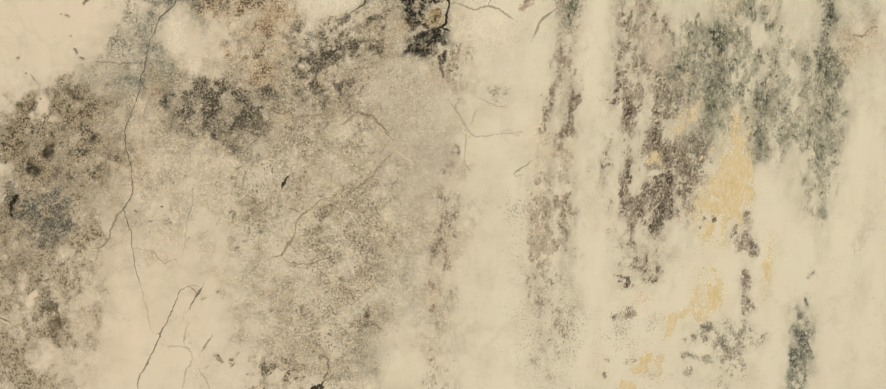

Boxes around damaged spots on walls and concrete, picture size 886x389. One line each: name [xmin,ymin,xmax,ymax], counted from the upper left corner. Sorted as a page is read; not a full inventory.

crack [122,0,205,387]
leakage [0,0,472,389]
crack [310,359,329,389]
leakage [498,0,595,388]
leakage [597,0,849,389]